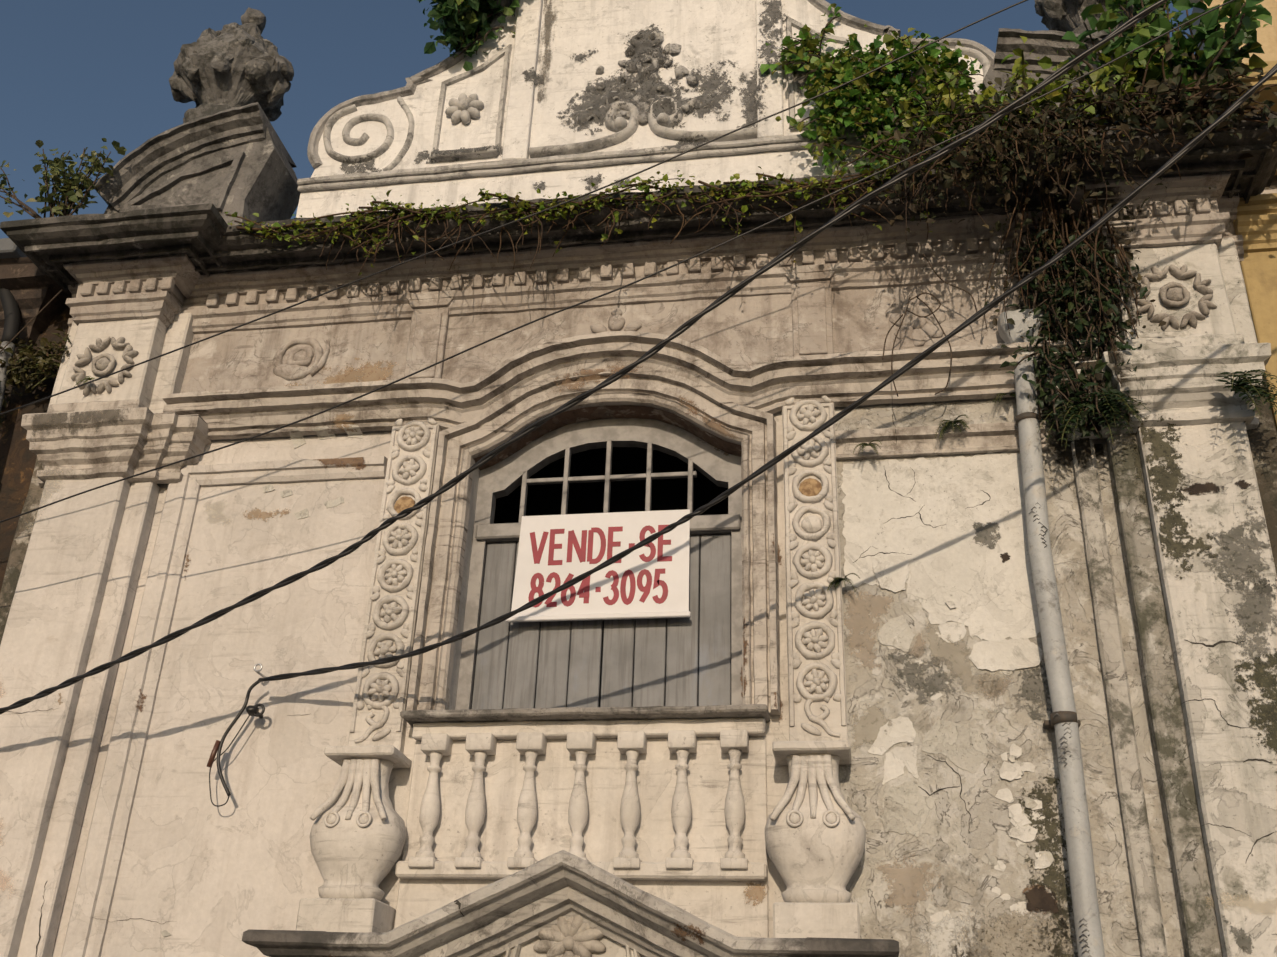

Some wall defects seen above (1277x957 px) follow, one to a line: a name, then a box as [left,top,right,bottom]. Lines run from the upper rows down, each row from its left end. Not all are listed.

crack [853,408,990,563]
water stain [1201,496,1277,661]
peeling [841,451,1054,871]
crack [36,882,47,954]
spalling [877,854,1092,957]